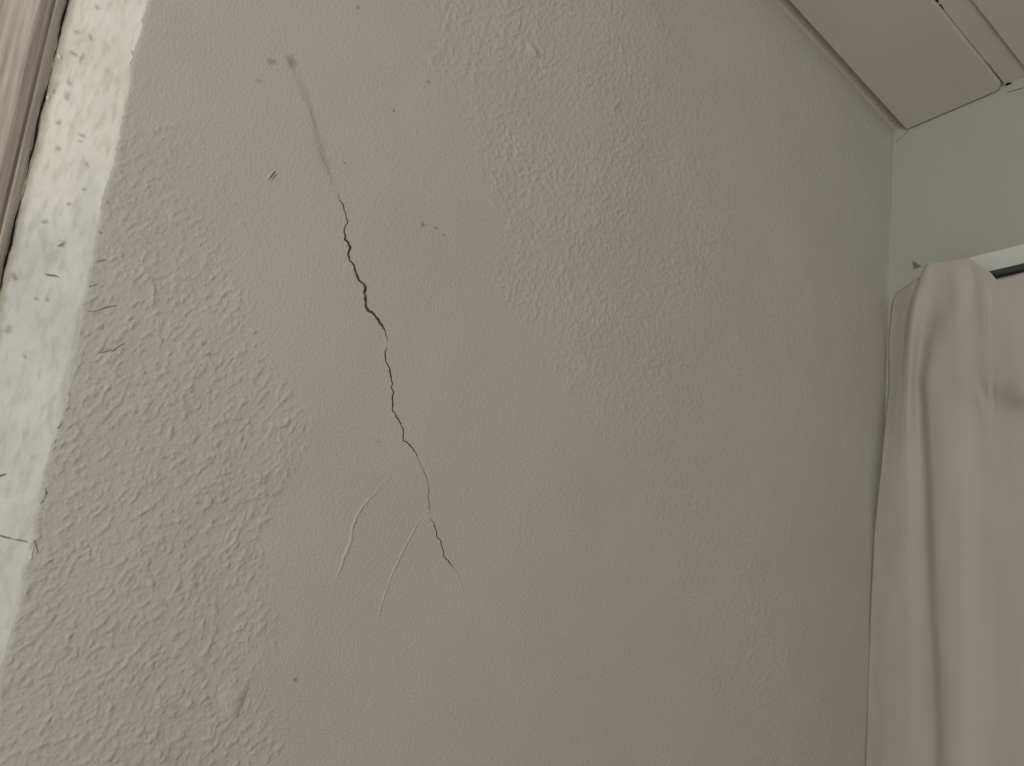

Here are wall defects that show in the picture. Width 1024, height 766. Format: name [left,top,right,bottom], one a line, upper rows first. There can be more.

crack [309,107,465,593]